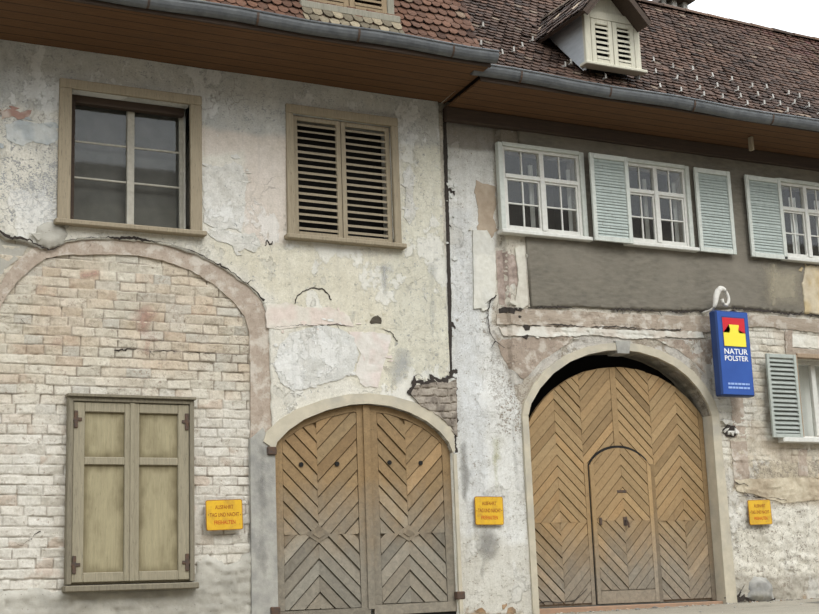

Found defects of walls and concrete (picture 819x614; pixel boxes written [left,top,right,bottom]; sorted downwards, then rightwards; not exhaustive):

crack [0,230,265,301]
crack [295,286,332,303]
flaking render [265,302,394,396]
crack [275,323,398,341]
flaking render [469,227,496,311]
crack [487,295,505,348]
flaking render [498,245,704,344]
flaking render [411,377,458,437]